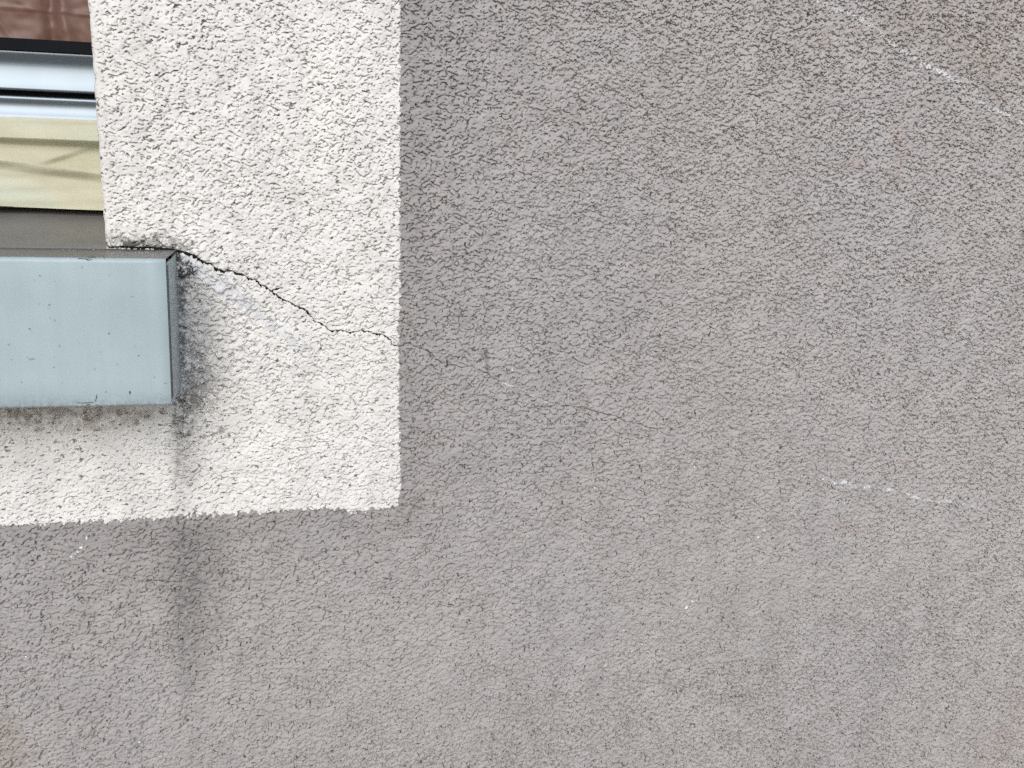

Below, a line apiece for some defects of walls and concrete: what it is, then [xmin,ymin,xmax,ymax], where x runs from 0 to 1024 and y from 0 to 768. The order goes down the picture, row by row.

damp [166,247,197,278]
crack [78,236,669,436]